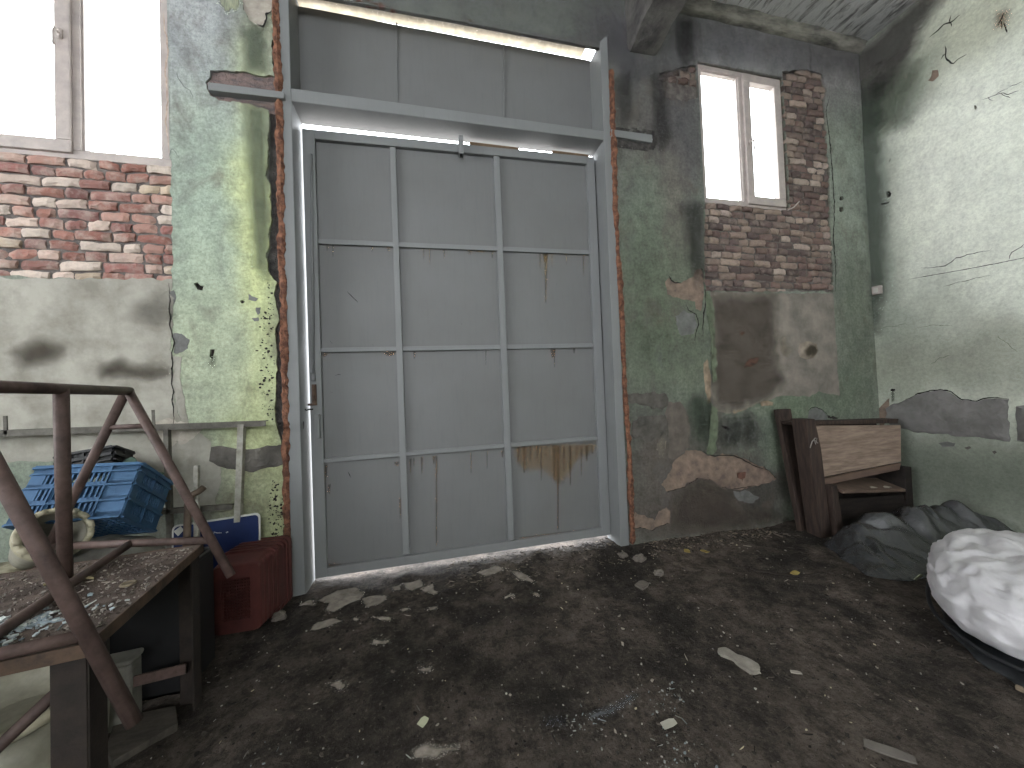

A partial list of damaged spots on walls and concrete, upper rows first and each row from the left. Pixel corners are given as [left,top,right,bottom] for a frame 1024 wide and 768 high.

spalling [219,0,272,27]
crack [930,16,967,64]
spalling [0,152,176,304]
crack [912,245,1023,286]
spalling [661,70,841,503]
damp [17,342,58,365]
damp [102,362,163,376]
crack [167,288,175,424]
peeling [634,508,671,530]